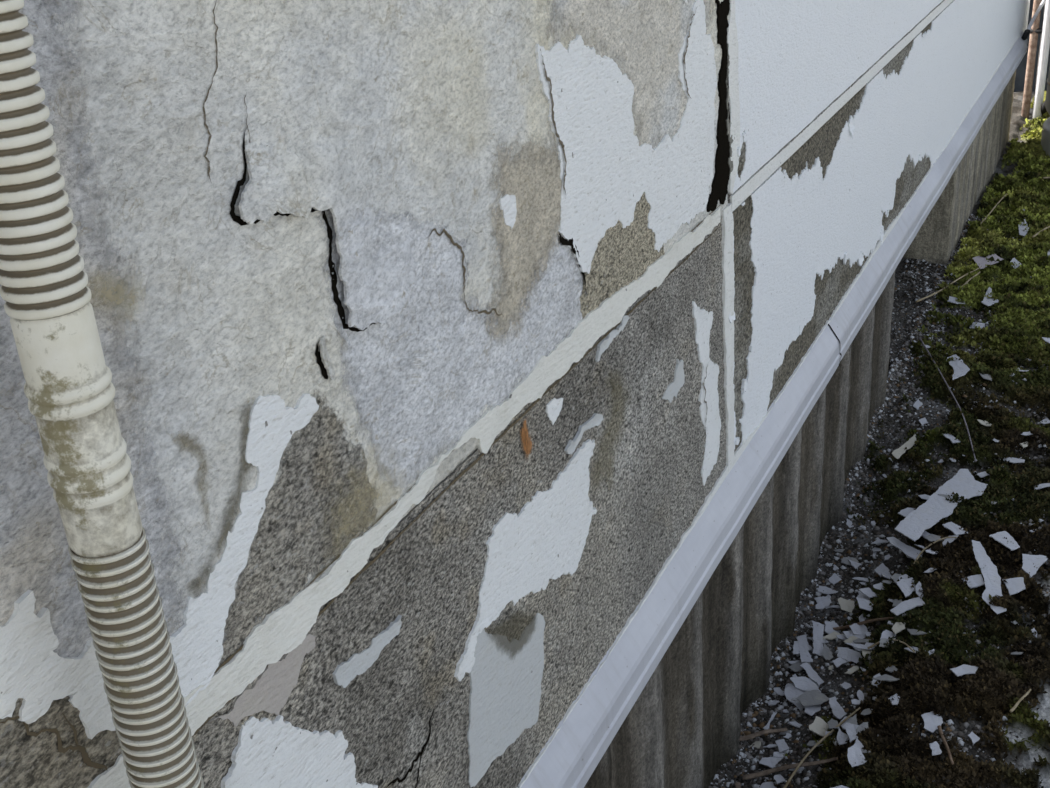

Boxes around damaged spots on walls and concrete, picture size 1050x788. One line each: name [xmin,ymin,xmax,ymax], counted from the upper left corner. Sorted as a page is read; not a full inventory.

peeling [18,0,180,635]
crack [203,3,218,181]
crack [230,92,504,380]
peeling [547,0,714,149]
crack [683,0,733,212]
peeling [776,85,866,179]
peeling [767,154,931,411]
peeling [880,23,932,78]
peeling [0,285,93,658]
peeling [192,131,755,788]
crack [386,708,436,788]